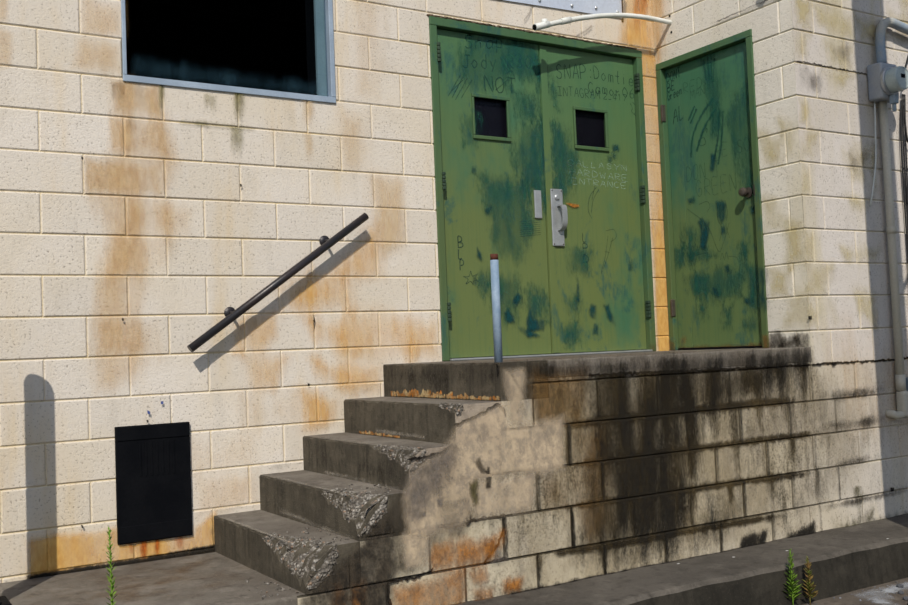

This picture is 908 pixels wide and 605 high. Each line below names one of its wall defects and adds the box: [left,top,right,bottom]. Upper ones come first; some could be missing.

damp [404,185,819,595]
spalling [359,431,426,472]
spalling [321,488,388,537]
spalling [262,532,338,590]